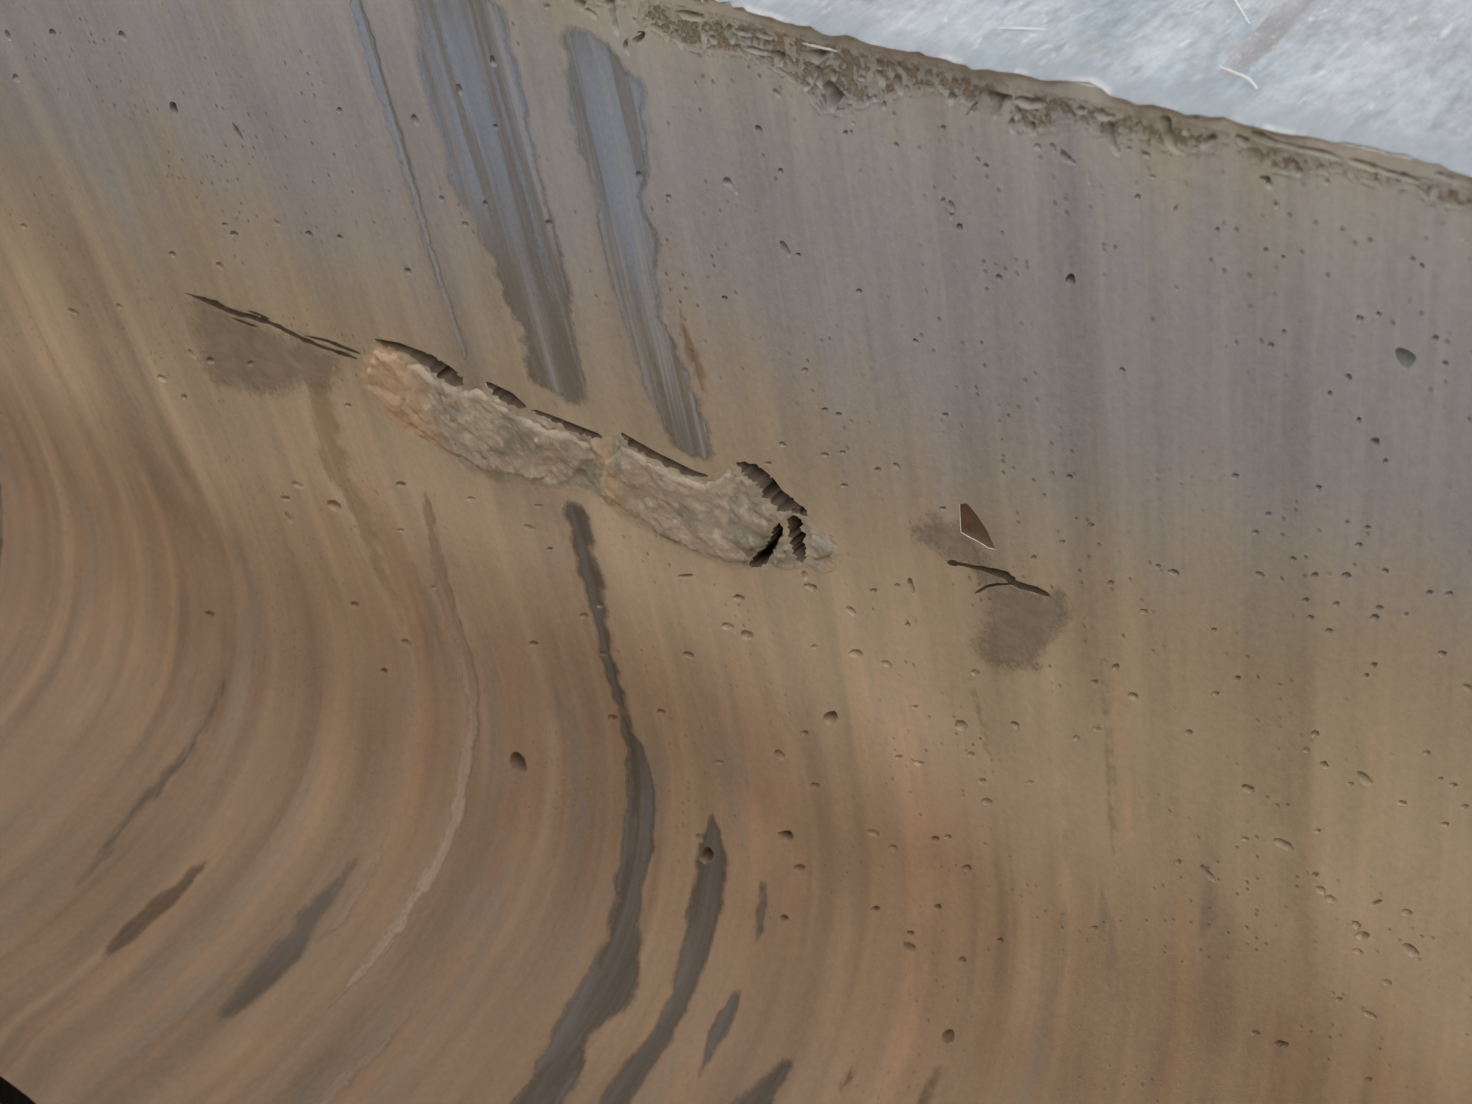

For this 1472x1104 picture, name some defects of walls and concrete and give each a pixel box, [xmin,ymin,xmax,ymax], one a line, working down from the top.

damp [350,0,466,359]
damp [413,0,585,403]
damp [563,29,711,460]
spalling [357,338,844,575]
spalling [960,503,995,549]
crack [945,560,1051,597]
damp [511,503,654,1104]
crack [0,1076,36,1104]
damp [600,815,726,1104]
damp [701,993,738,1069]
damp [731,1061,791,1104]